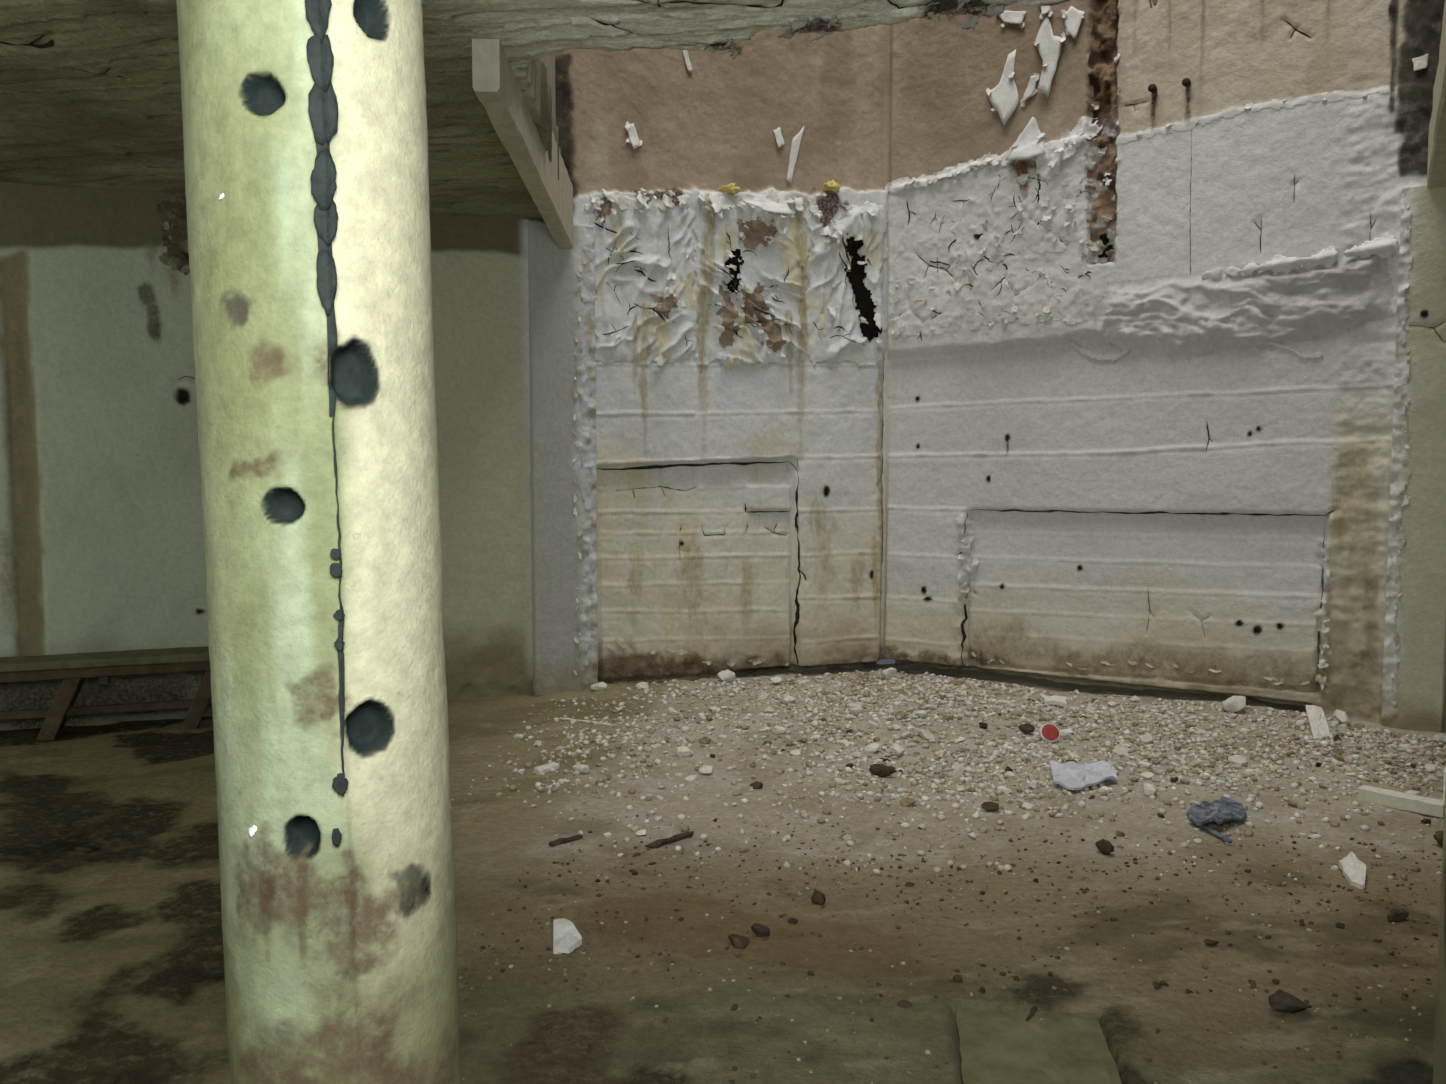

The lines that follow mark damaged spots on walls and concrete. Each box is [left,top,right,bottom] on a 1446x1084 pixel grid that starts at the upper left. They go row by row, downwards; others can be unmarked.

crack [592,0,784,34]
leakage [139,284,160,337]
peeling [572,0,1389,697]
crack [598,461,806,668]
crack [959,509,1334,691]
leakage [396,864,431,916]
leakage [241,1013,452,1084]
leakage [507,1007,687,1084]